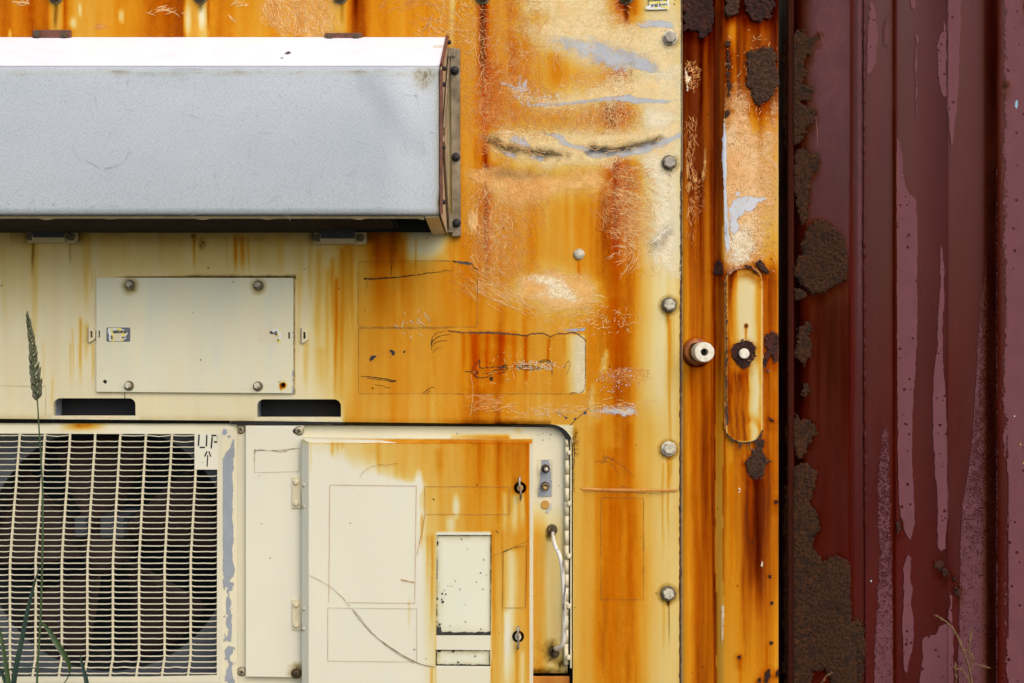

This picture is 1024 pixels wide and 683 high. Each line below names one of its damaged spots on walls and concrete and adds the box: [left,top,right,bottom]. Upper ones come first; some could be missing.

rust [0,0,50,37]
rust [136,0,185,37]
rust [214,0,231,37]
rust [348,0,390,37]
rust [615,0,638,20]
rust [475,0,518,121]
rust [461,302,506,424]
rust [683,0,866,683]
rust [590,162,638,683]
rust [426,439,533,492]
peeling [222,429,235,683]